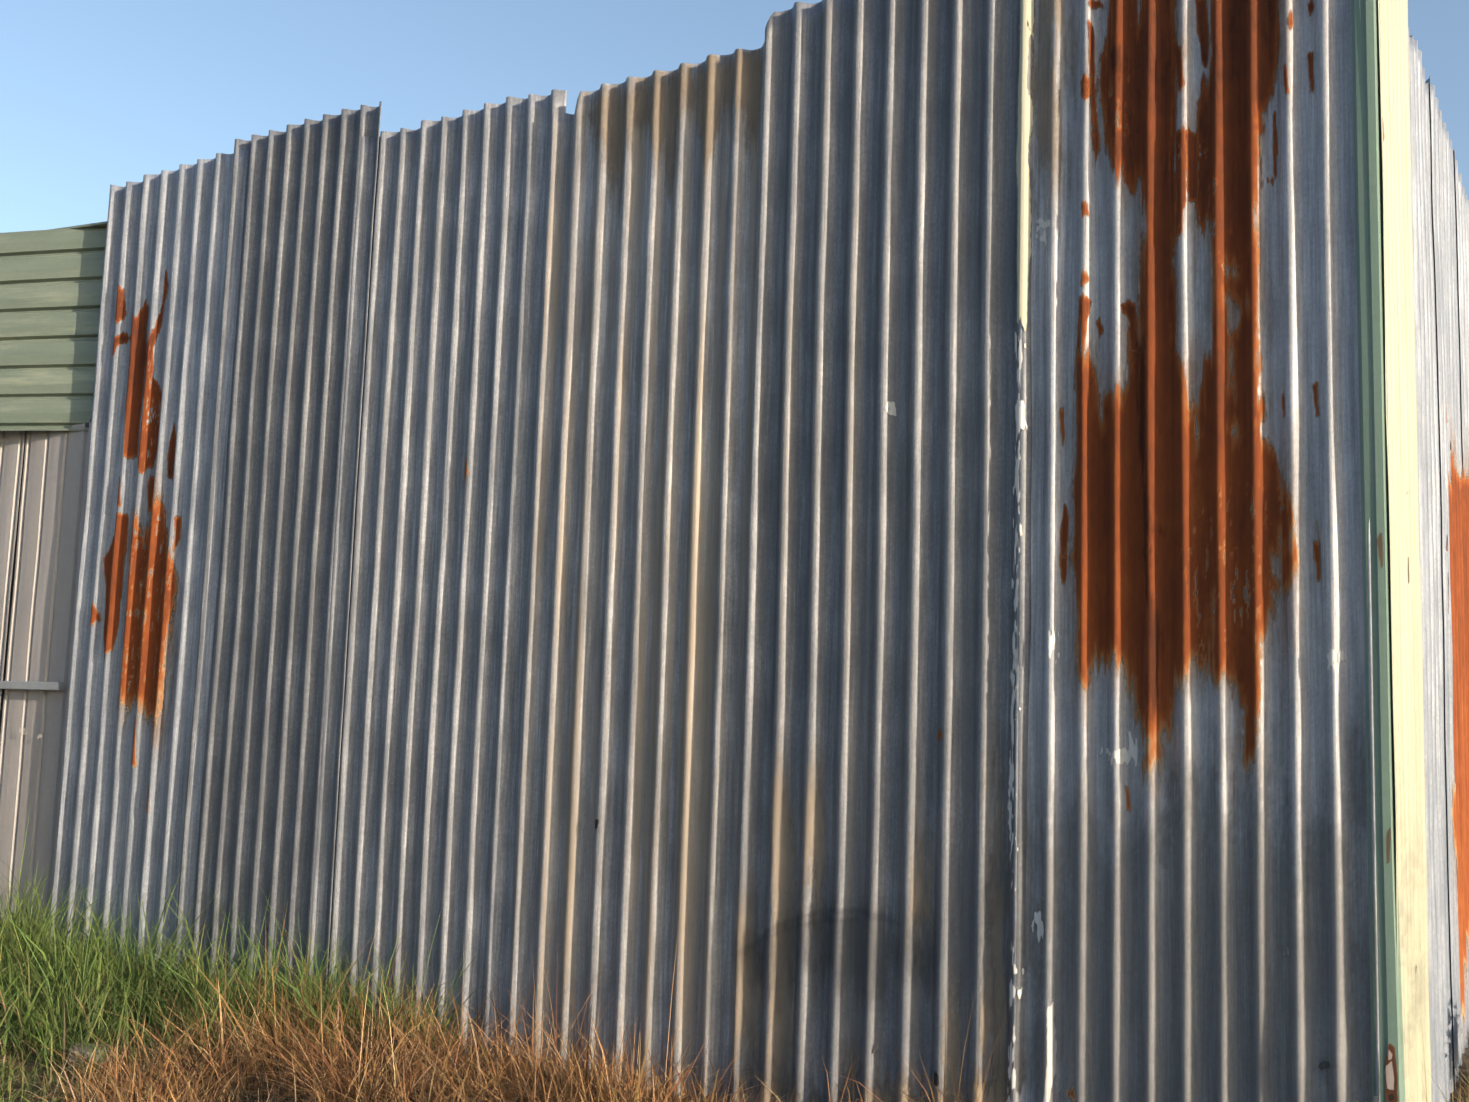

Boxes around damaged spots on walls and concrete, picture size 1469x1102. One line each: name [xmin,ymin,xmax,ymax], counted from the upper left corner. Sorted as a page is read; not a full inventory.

rust [90,271,182,768]
rust [1059,0,1320,812]
rust [1447,441,1469,1022]
rust [1385,1044,1398,1102]